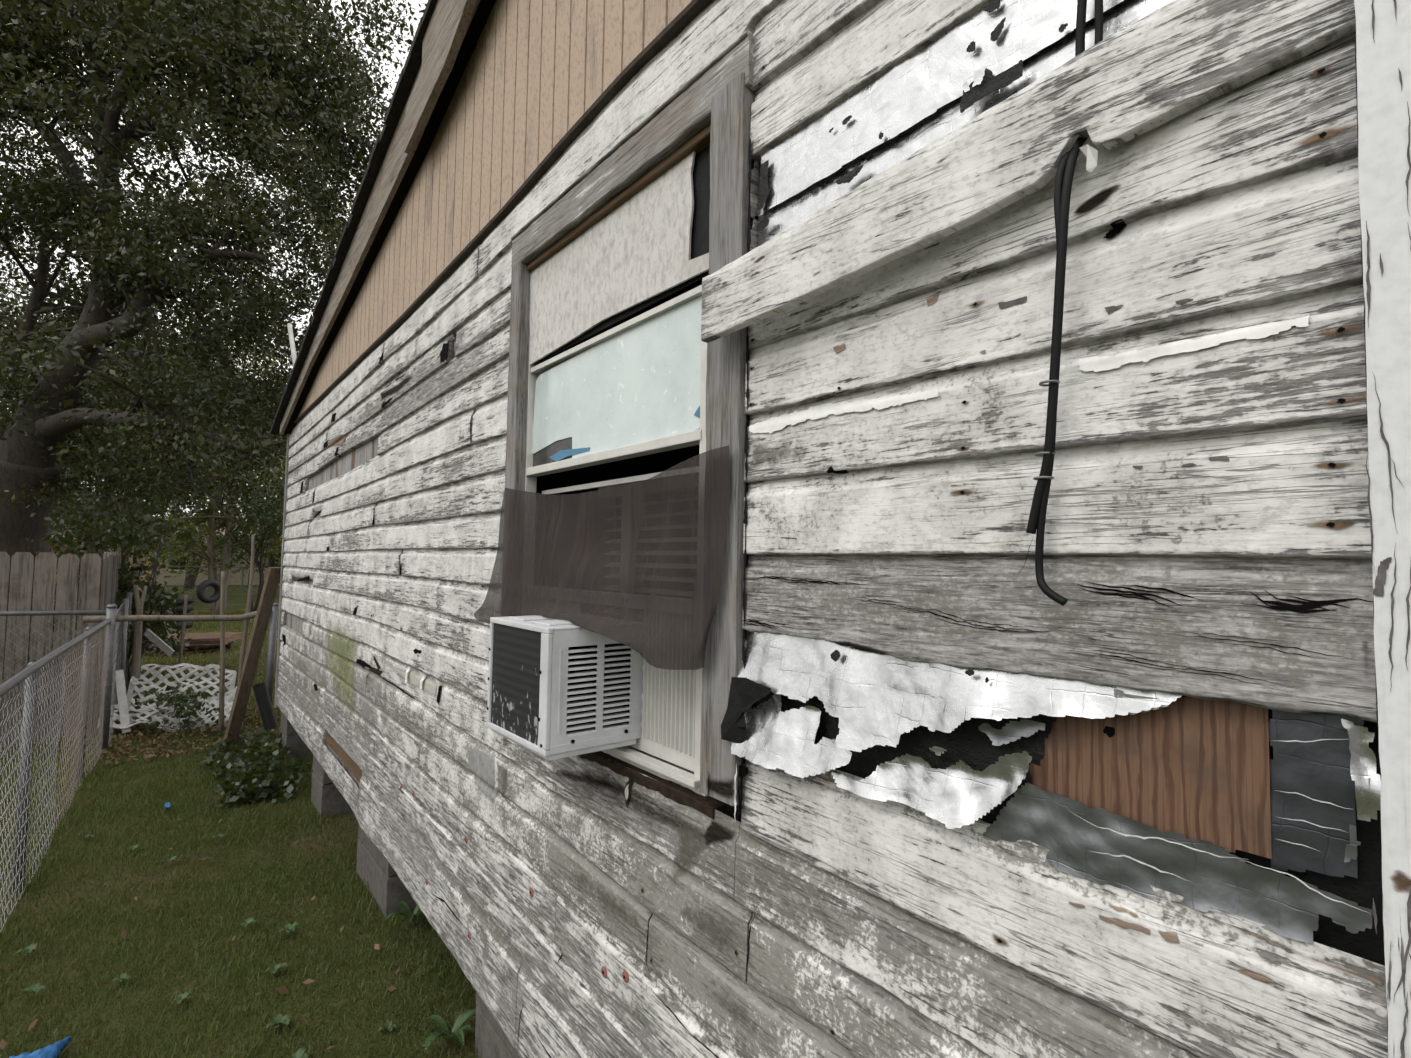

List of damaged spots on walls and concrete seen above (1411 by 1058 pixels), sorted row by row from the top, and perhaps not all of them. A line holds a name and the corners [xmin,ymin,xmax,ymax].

crack [1371,0,1397,43]
peeling [962,68,985,92]
peeling [1080,144,1098,172]
crack [1366,68,1411,328]
crack [743,372,1411,693]
peeling [1114,689,1169,715]
peeling [979,719,1045,746]
peeling [1099,905,1179,943]
peeling [1237,970,1276,983]
peeling [1312,958,1382,986]